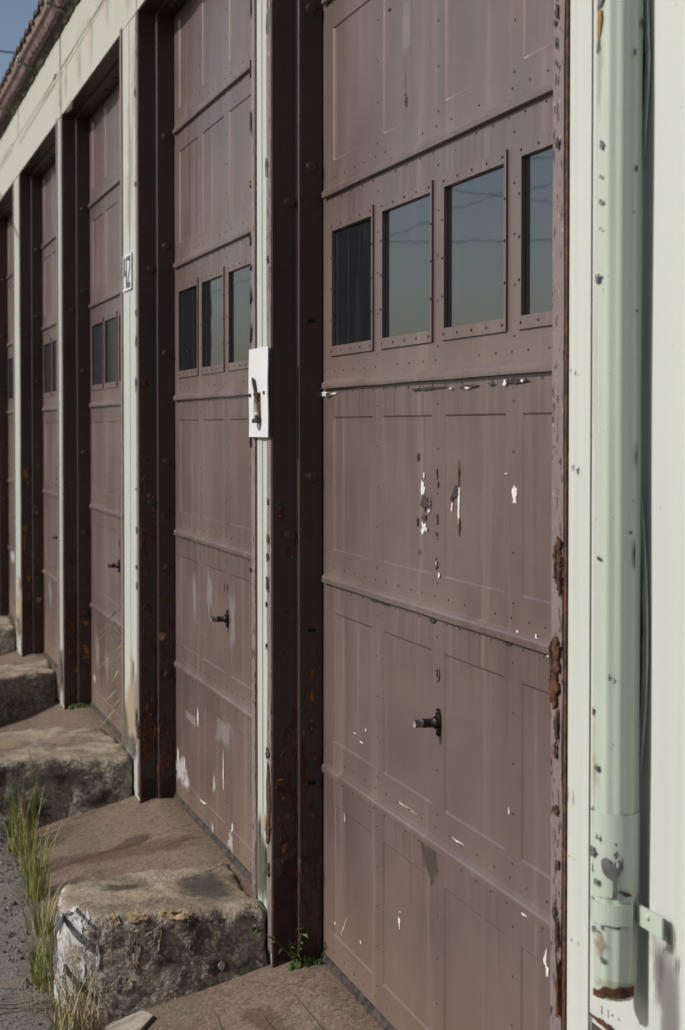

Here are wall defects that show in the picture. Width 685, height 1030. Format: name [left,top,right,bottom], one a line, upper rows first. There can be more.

peeling [412,378,527,391]
rust [140,459,173,556]
peeling [416,452,439,536]
peeling [450,463,460,536]
rust [552,536,564,597]
rust [548,636,564,759]
rust [141,710,173,773]
rust [265,747,296,853]
peeling [589,834,632,900]
rust [589,1012,614,1030]
rust [593,985,635,999]